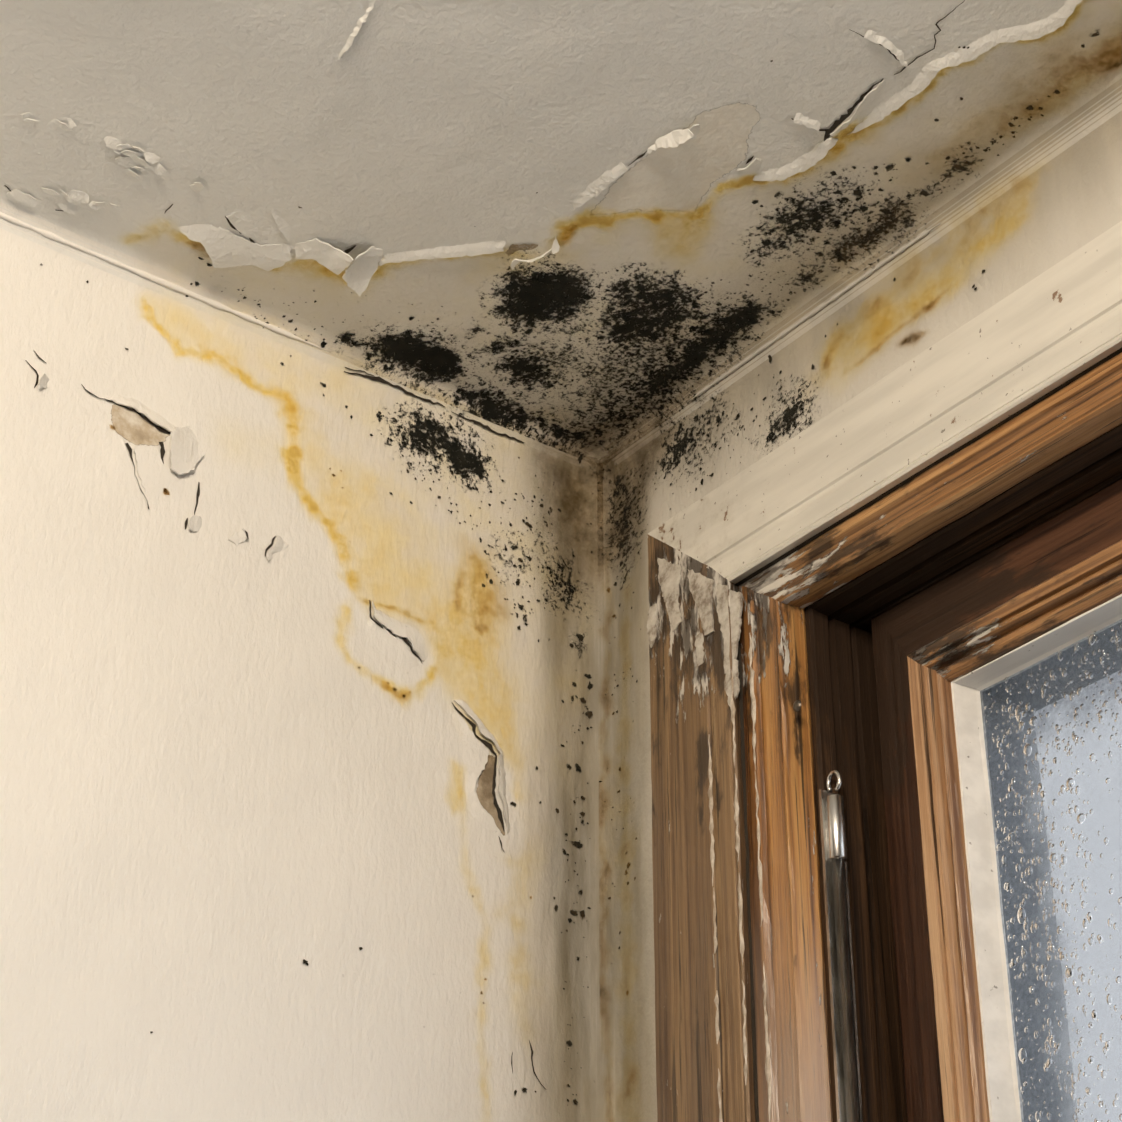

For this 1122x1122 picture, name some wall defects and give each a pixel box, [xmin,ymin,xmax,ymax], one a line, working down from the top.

peeling [573,0,1082,215]
crack [791,0,965,141]
peeling [178,209,560,297]
water stain [237,90,1060,630]
flaking render [81,384,205,532]
crack [367,600,428,669]
water stain [561,633,593,747]
peeling [450,699,510,851]
water stain [555,757,625,883]
water stain [553,890,591,933]